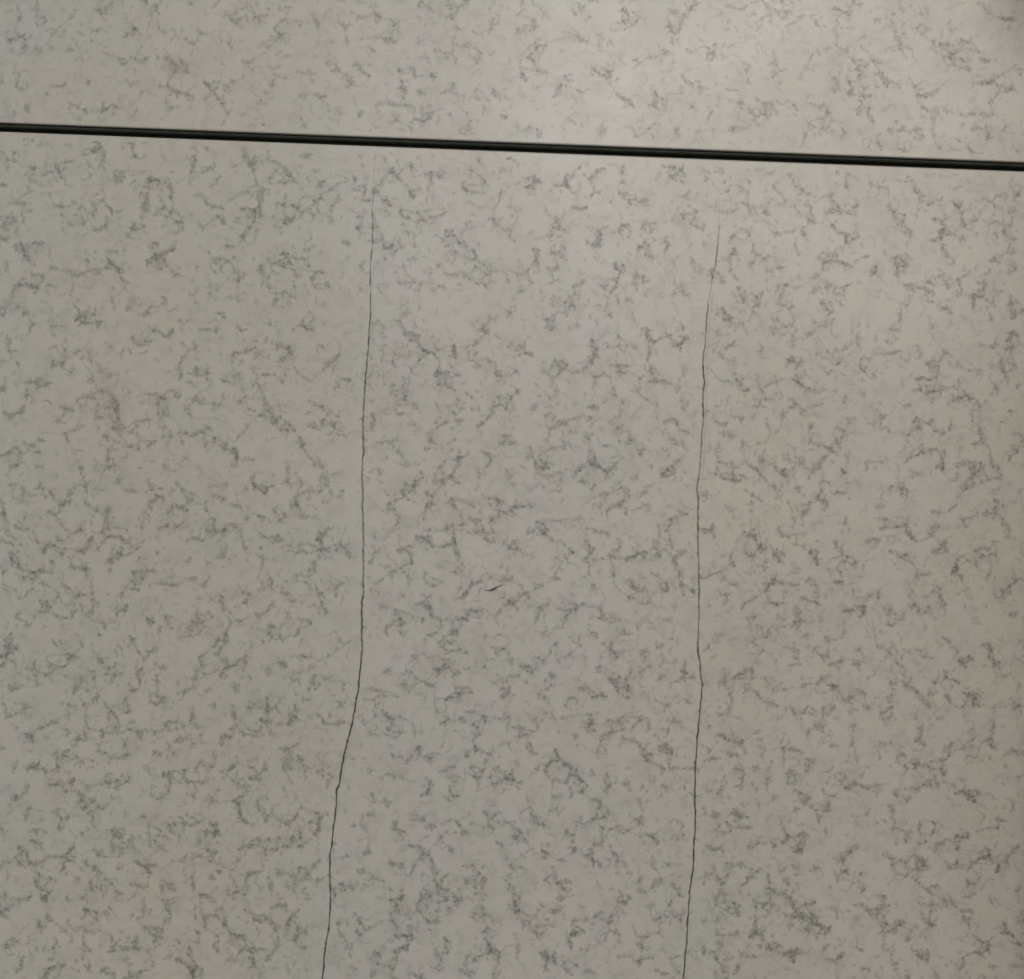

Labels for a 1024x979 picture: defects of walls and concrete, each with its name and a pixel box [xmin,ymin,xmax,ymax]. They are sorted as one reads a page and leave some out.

crack [322,585,364,979]
crack [683,643,703,979]